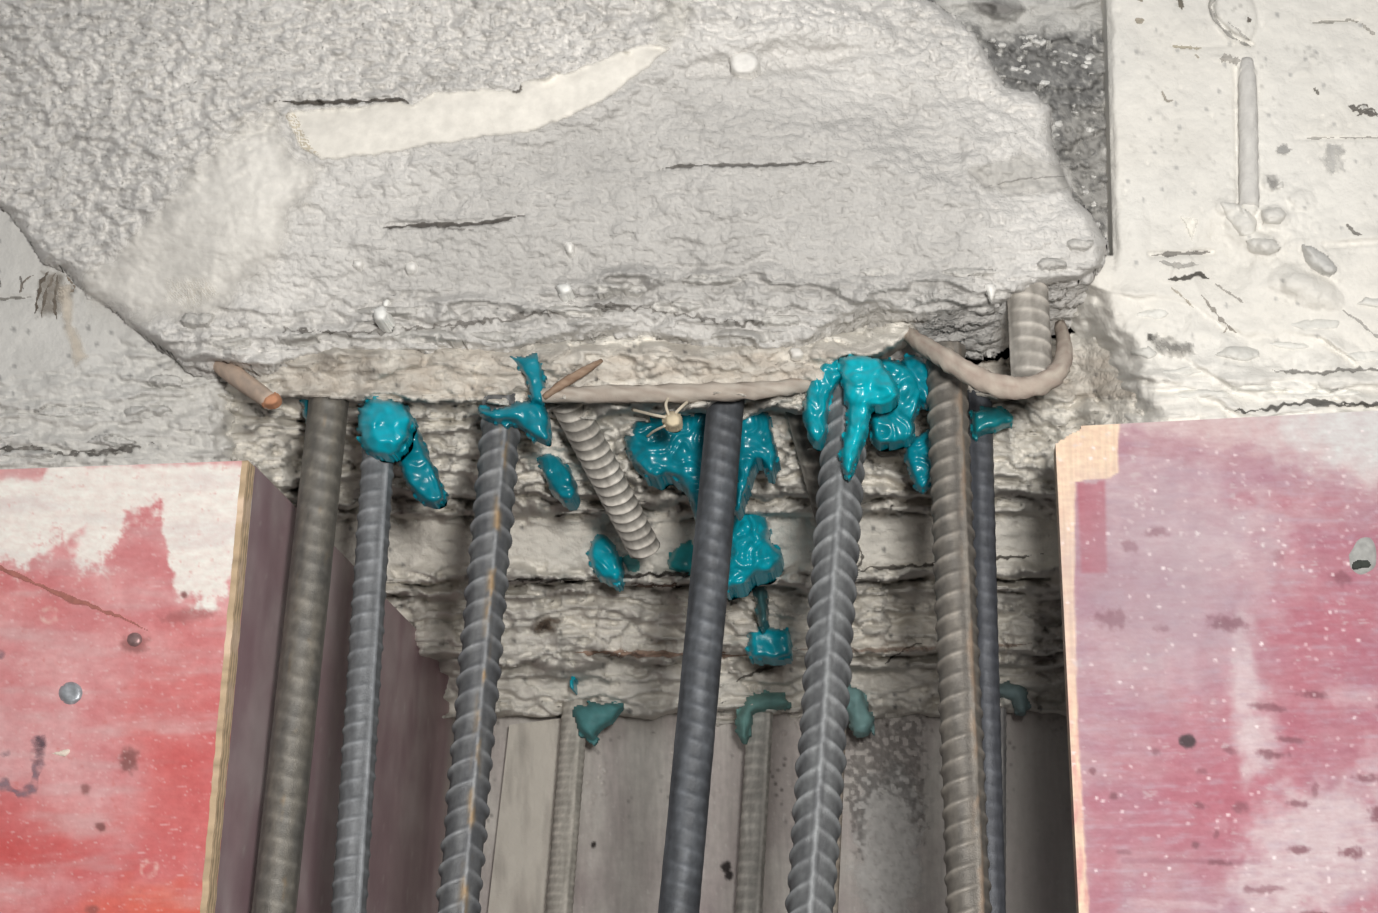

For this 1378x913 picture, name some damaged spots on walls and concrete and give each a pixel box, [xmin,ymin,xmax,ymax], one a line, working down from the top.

spalling [0,431,154,459]
spalling [34,404,172,424]
spalling [251,397,394,913]
spalling [436,393,521,913]
spalling [534,617,560,633]
spalling [0,0,1109,410]
spalling [541,378,867,913]
spalling [891,345,1007,913]